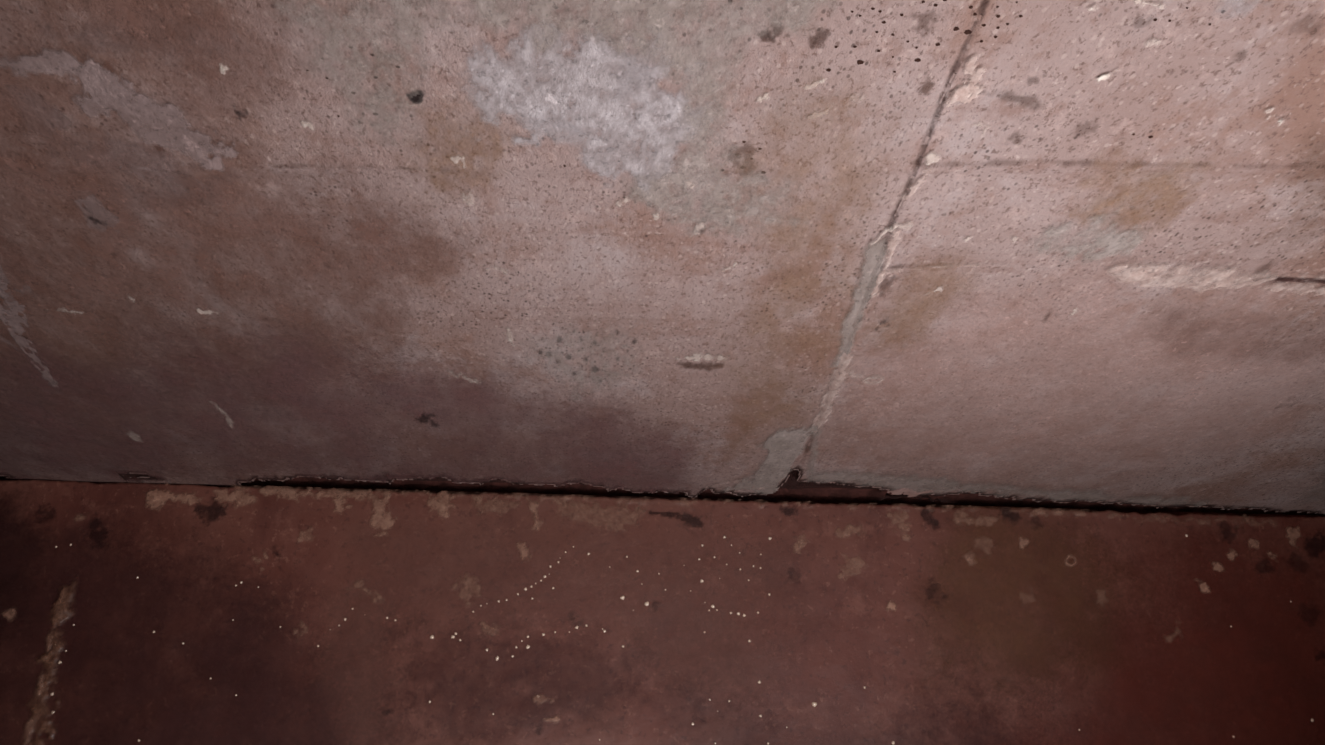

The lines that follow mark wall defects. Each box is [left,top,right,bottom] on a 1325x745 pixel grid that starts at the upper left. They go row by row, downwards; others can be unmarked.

water stain [468,0,825,230]
crack [946,57,986,107]
water stain [0,0,689,493]
crack [813,153,940,432]
crack [1237,276,1325,284]
crack [0,467,1325,527]
water stain [0,510,353,745]